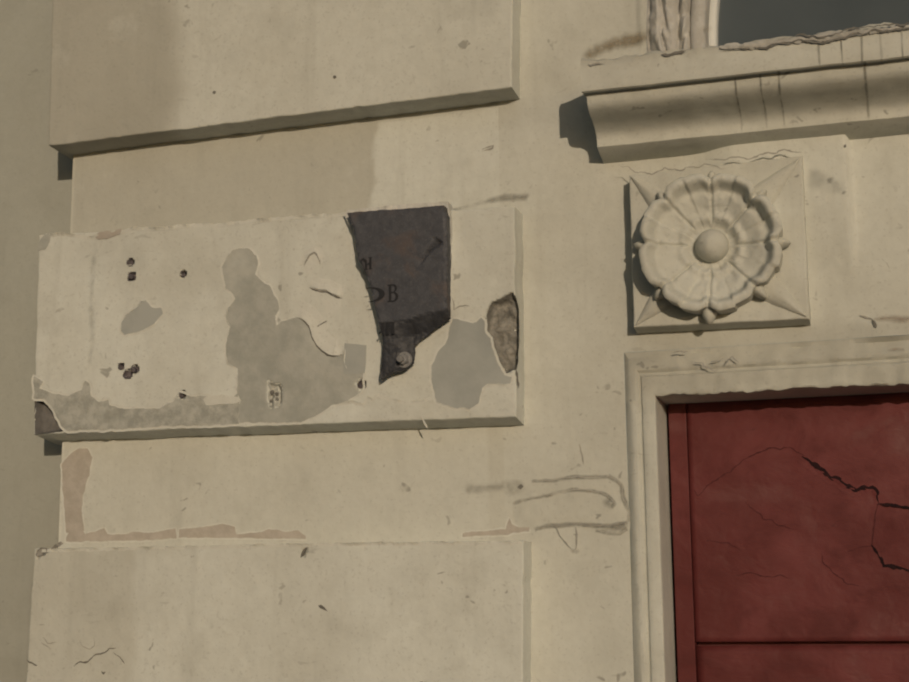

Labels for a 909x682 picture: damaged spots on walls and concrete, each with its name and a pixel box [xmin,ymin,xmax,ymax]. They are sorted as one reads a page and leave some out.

peeling [31,245,519,434]
peeling [36,446,308,557]
crack [694,447,909,572]